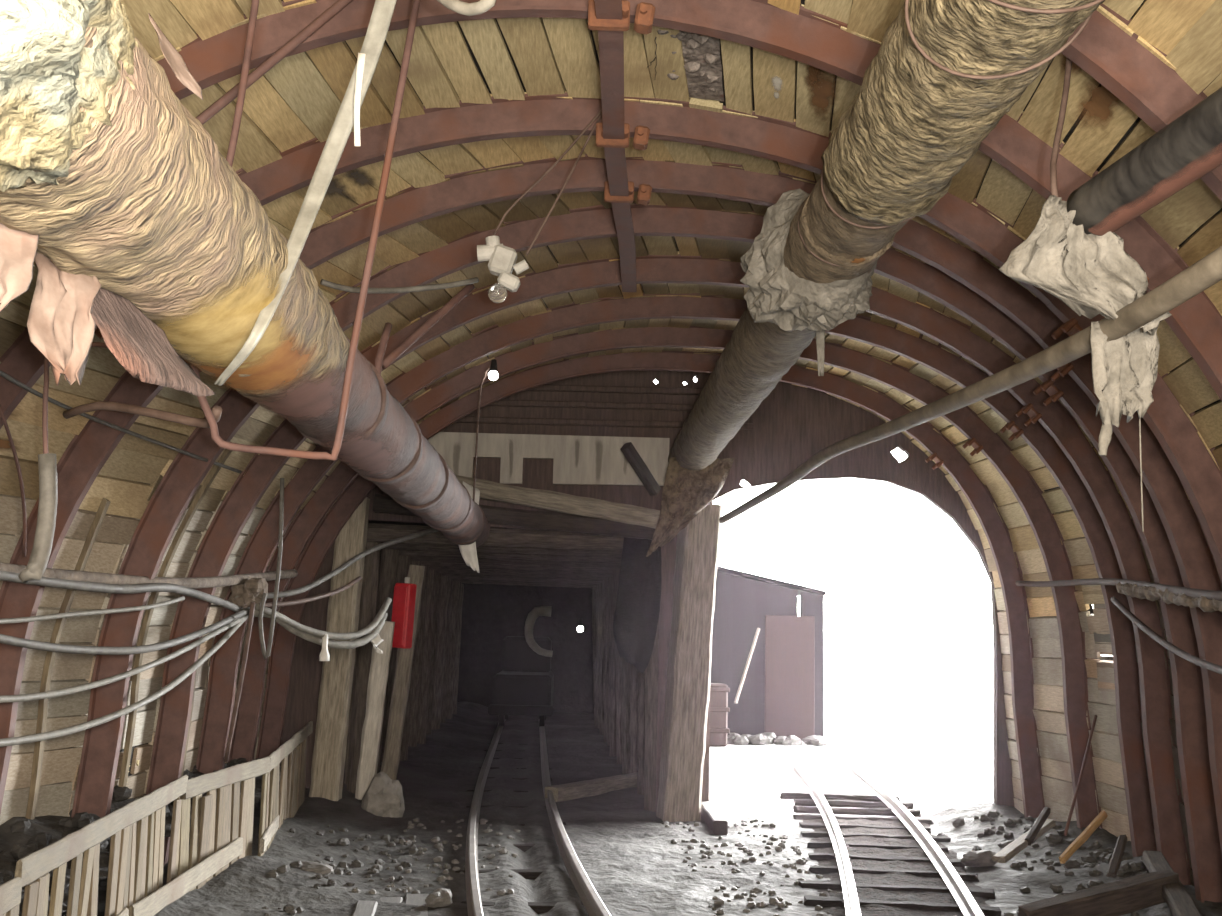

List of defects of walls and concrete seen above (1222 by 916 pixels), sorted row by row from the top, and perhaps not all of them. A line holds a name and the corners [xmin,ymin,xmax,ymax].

spalling [657,29,724,101]
corrosion [1089,145,1222,236]